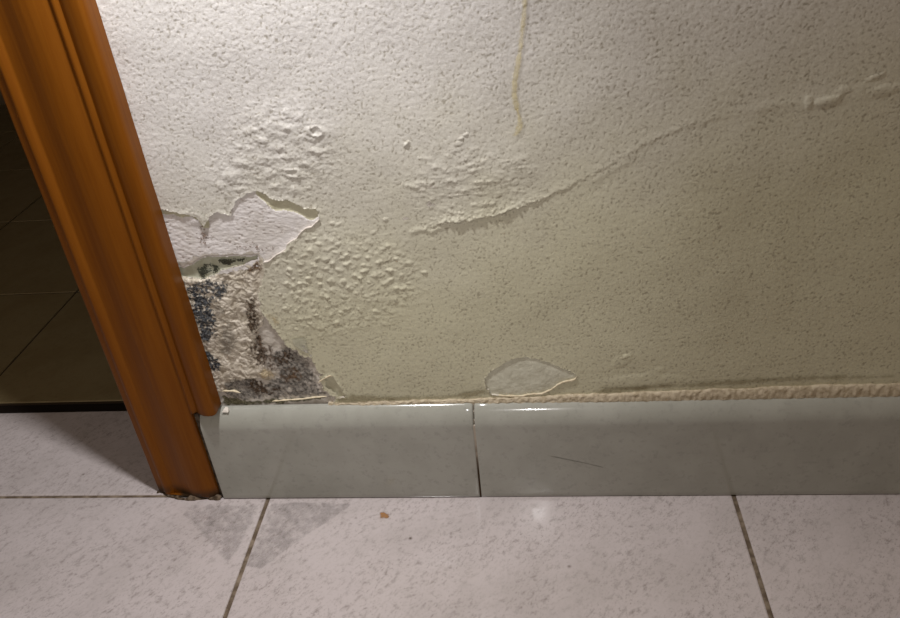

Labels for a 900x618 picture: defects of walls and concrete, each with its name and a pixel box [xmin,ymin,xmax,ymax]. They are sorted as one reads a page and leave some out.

damp [187,242,273,371]
flaking render [160,187,349,406]
damp [223,298,330,406]